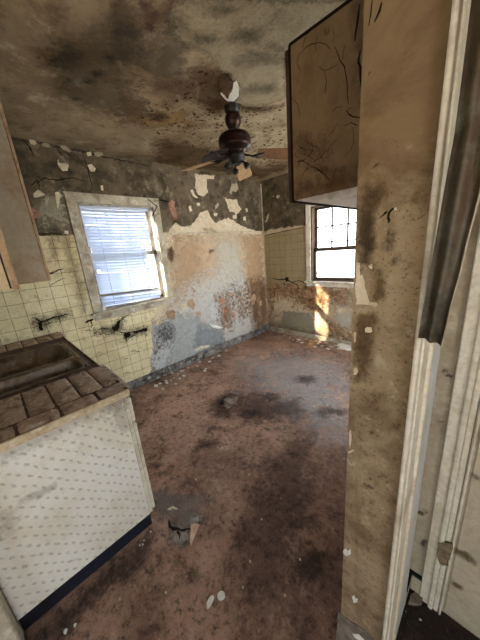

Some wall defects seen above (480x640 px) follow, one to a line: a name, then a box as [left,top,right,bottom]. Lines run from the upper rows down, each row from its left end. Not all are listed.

peeling [164,0,346,112]
crack [11,138,145,188]
damp [115,66,239,175]
damp [241,107,288,178]
peeling [168,173,261,235]
damp [358,186,382,263]
crack [272,277,307,289]
peeling [266,262,377,343]
damp [374,273,384,300]
peeling [93,299,227,390]
damp [356,314,375,379]
spalling [437,541,453,566]